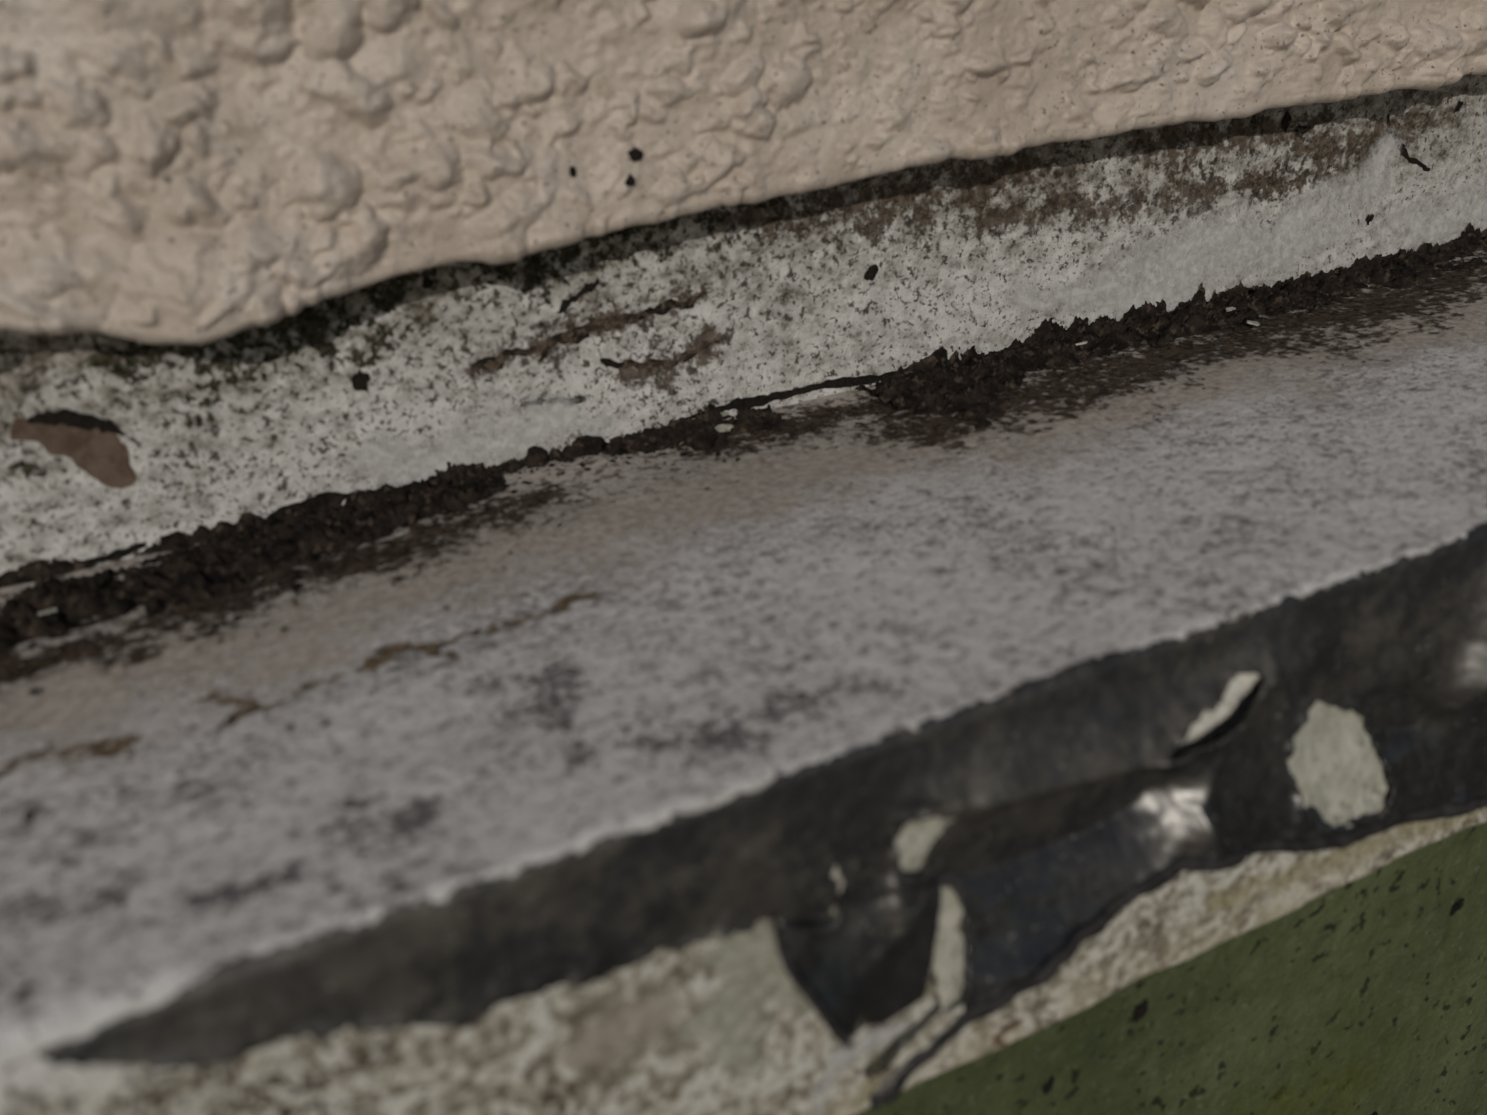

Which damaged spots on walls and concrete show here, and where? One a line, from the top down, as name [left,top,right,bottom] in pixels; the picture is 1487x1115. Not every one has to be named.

spalling [625,147,644,186]
spalling [1281,112,1311,138]
spalling [864,264,879,281]
water stain [461,91,1445,398]
water stain [0,266,1487,779]
water stain [177,792,460,922]
peeling [35,522,1487,1110]